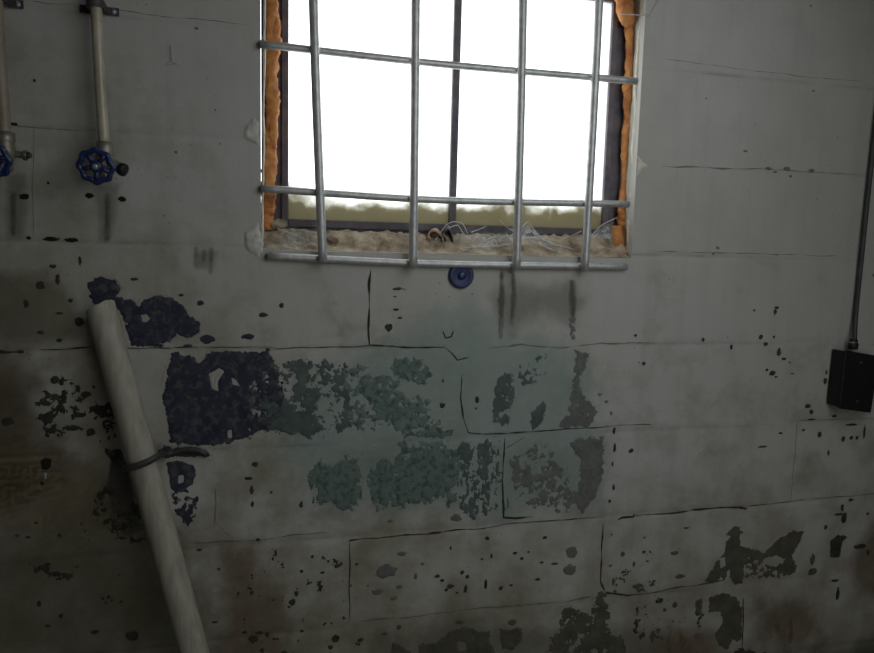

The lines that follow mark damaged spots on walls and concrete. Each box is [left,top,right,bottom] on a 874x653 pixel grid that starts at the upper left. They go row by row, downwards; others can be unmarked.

peeling [35,375,124,463]
peeling [87,276,616,526]
leakage [0,366,176,653]
peeling [546,561,656,653]
peeling [627,597,677,642]
peeling [672,526,804,653]
peeling [830,535,847,558]